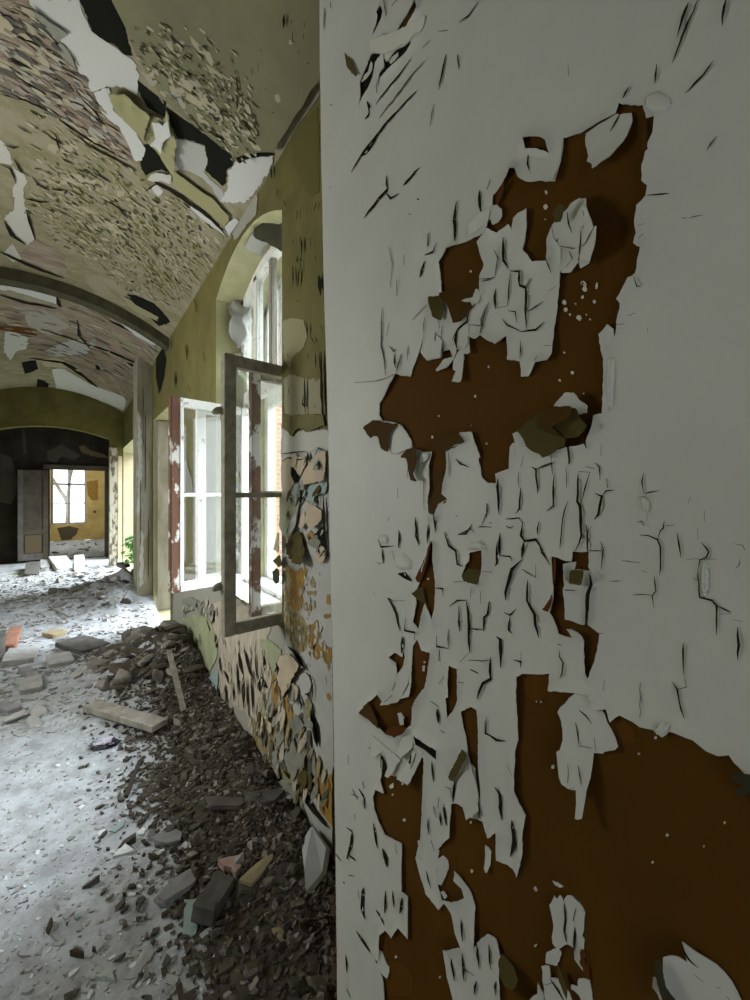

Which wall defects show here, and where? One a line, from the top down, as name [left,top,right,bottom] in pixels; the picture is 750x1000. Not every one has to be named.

crack [351,1,478,172]
crack [654,0,698,82]
crack [687,61,713,92]
crack [720,0,728,26]
spalling [0,0,282,326]
crack [364,168,419,218]
peeling [521,133,596,273]
spalling [0,285,166,410]
spalling [173,413,335,861]
crack [377,427,742,742]
peeling [551,693,618,820]
peeling [652,942,741,1000]